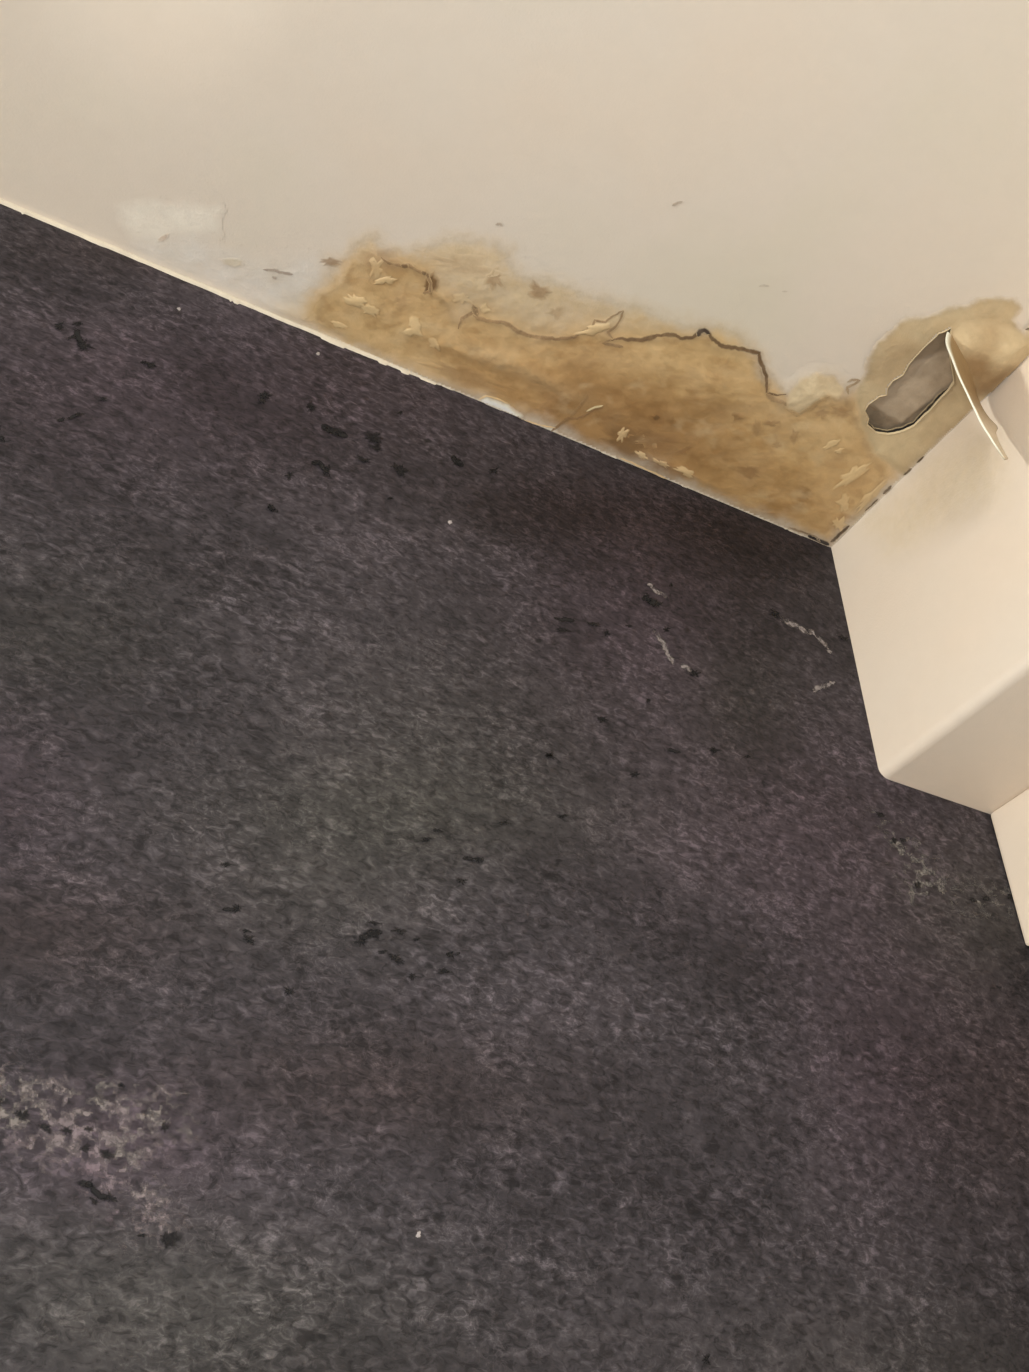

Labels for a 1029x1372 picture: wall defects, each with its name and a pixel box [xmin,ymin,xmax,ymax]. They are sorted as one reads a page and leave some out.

peeling [475,394,559,433]
water stain [122,221,1029,571]
peeling [864,328,1008,460]